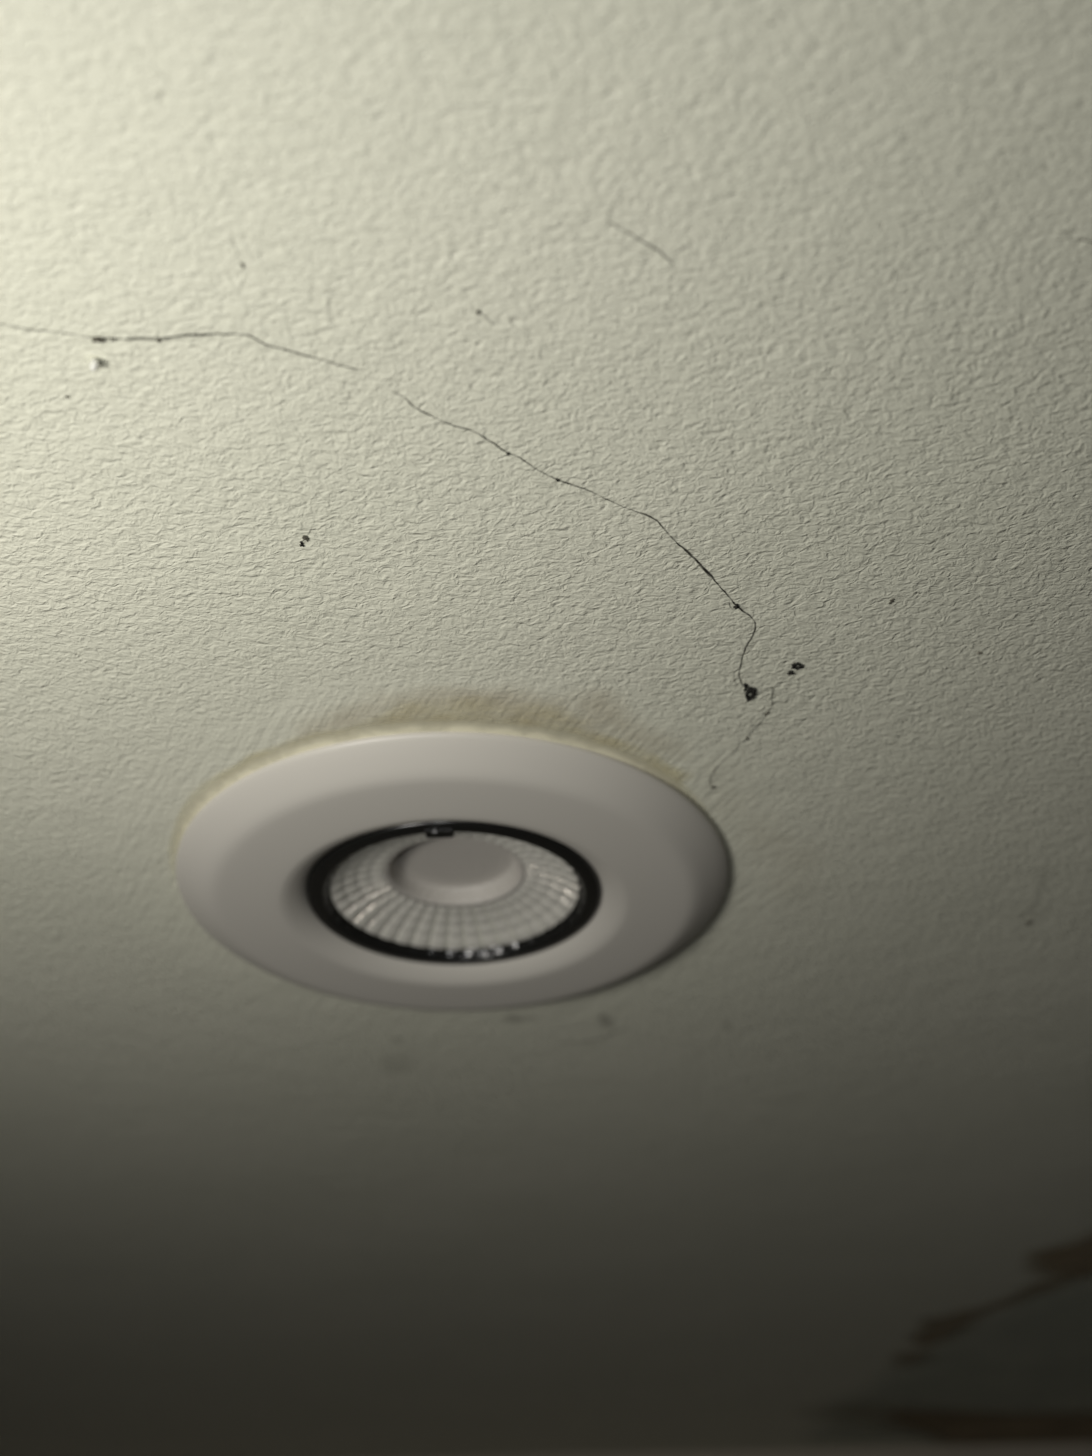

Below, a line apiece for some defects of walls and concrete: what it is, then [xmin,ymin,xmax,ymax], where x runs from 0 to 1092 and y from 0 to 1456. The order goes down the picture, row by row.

crack [43,330,355,369]
crack [407,400,804,740]